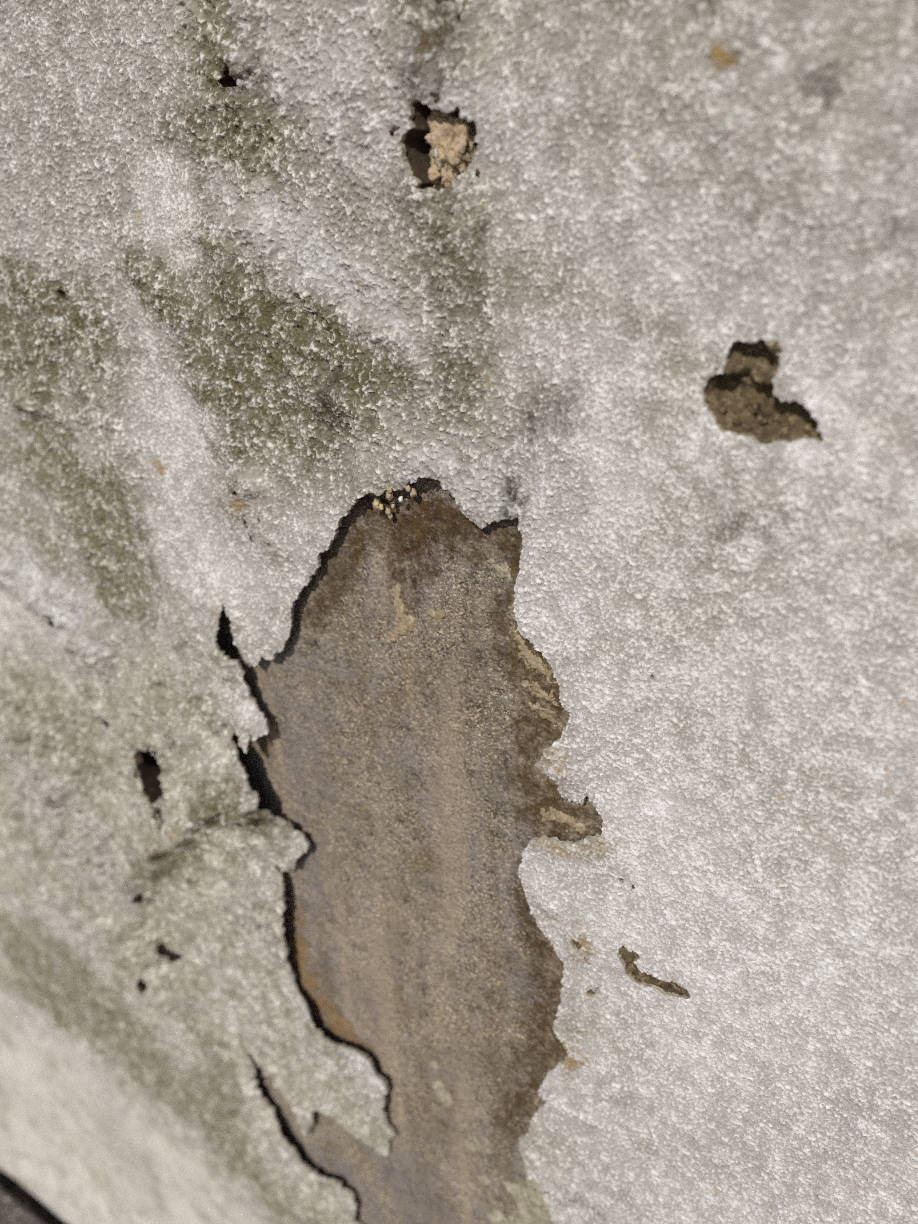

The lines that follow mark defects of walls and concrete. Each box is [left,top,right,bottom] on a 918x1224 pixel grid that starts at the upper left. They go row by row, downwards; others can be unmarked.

spalling [389,92,481,199]
spalling [692,327,823,444]
peeling [216,478,609,1224]
spalling [614,946,690,996]